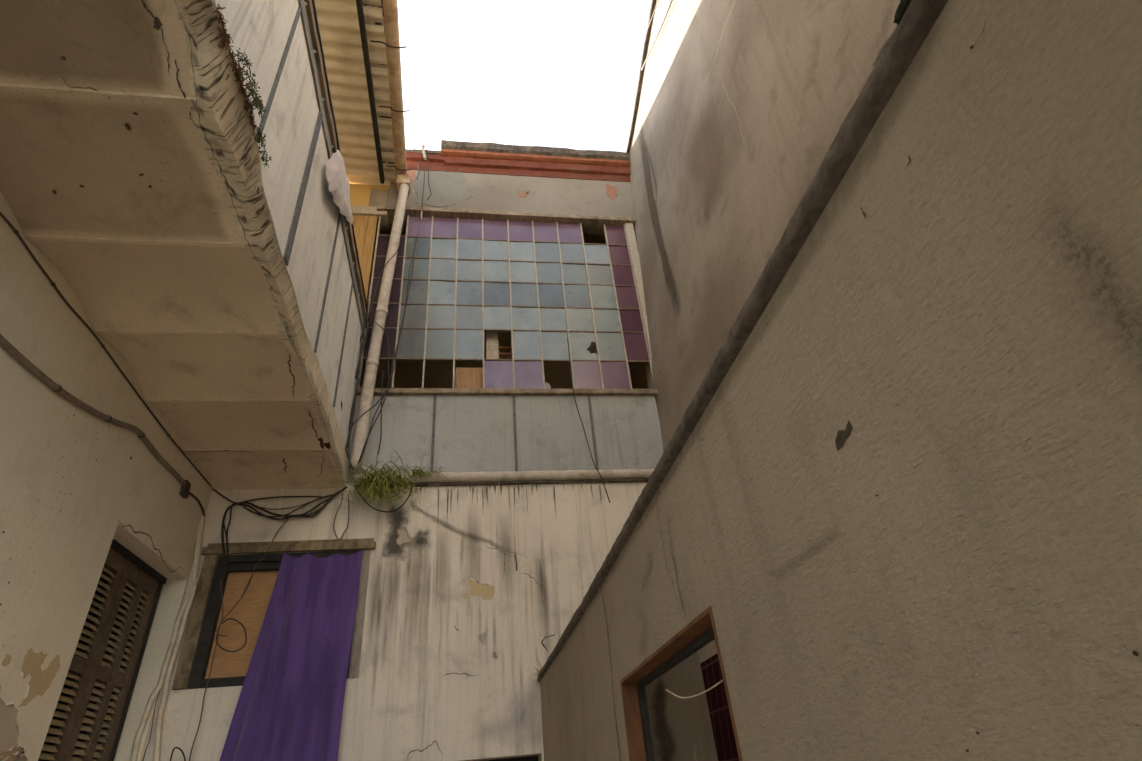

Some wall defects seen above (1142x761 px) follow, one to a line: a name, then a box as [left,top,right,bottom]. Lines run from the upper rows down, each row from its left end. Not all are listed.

crack [141,0,198,127]
crack [282,355,325,476]
leakage [383,485,537,570]
peeling [463,578,495,601]
peeling [0,648,60,761]
crack [407,741,443,759]